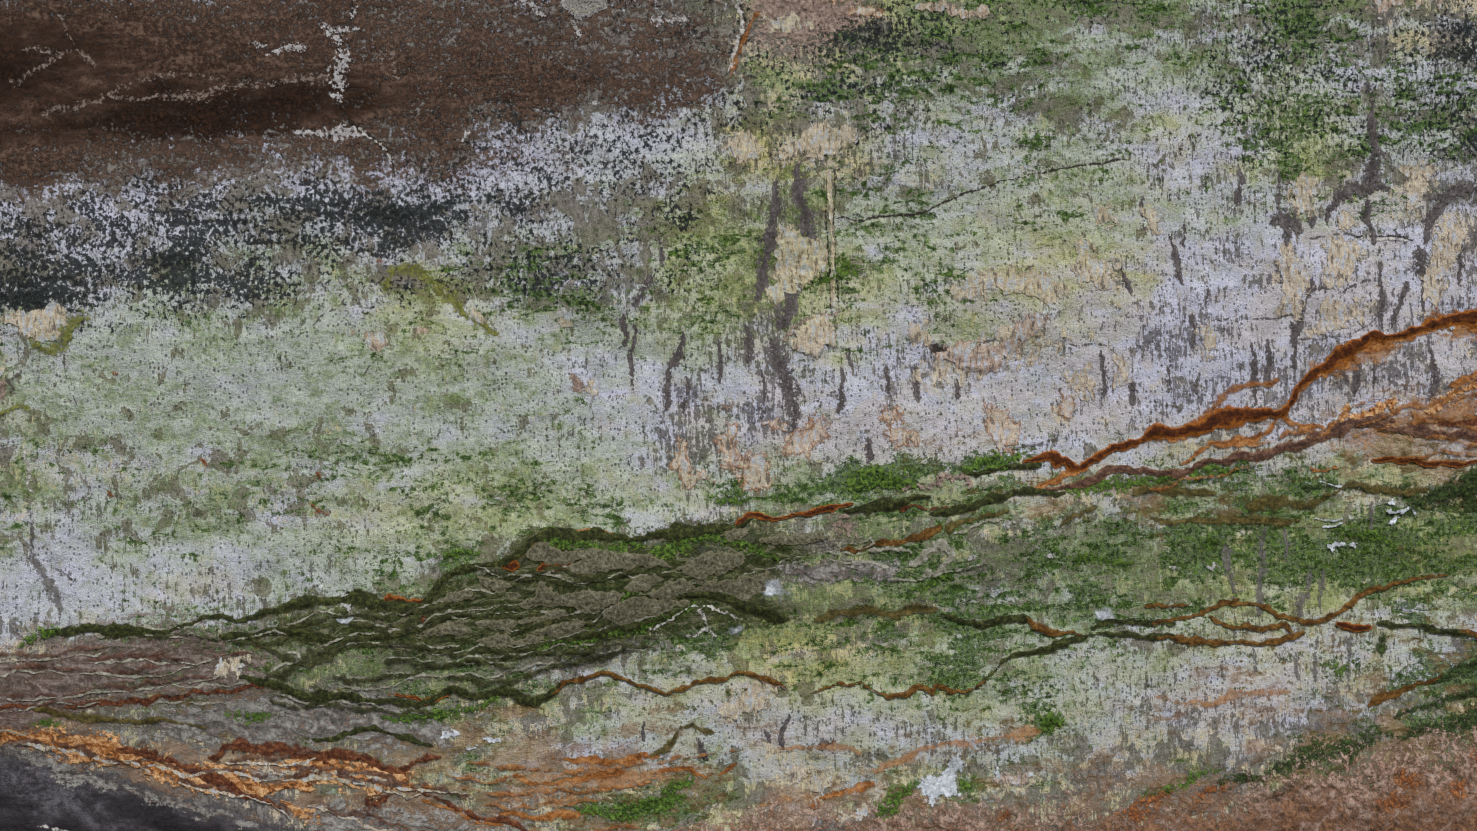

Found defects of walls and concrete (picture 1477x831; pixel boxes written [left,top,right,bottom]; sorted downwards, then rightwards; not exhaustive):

water stain [0,0,753,245]
water stain [618,237,666,393]
water stain [661,331,691,418]
water stain [743,162,821,432]
water stain [835,348,853,414]
water stain [1098,350,1108,401]
rust [735,307,1477,526]
water stain [1128,381,1138,406]
water stain [1168,221,1187,285]
water stain [1250,81,1477,406]
rust [811,574,1477,700]
rust [0,645,786,831]